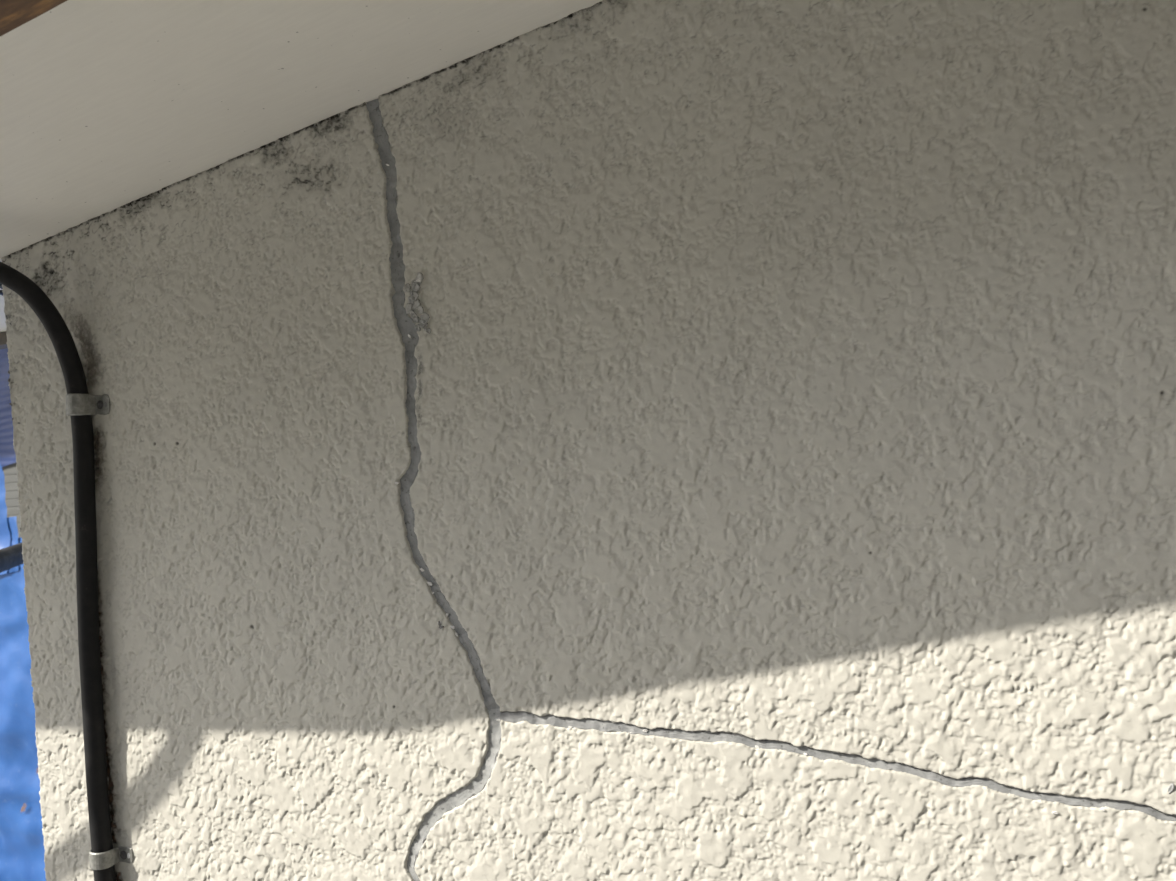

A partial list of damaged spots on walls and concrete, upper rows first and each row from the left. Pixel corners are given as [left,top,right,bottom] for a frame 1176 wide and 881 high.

crack [366,99,1176,881]